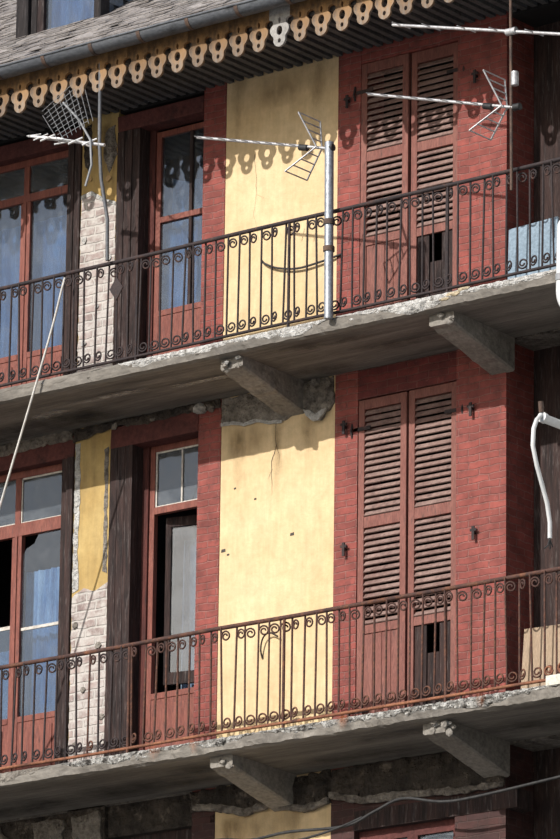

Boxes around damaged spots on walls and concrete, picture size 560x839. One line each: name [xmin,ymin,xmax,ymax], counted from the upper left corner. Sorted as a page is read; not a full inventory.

peeling [84,124,118,182]
flaking render [0,191,325,394]
spalling [335,269,556,325]
flaking render [303,376,335,421]
flaking render [0,394,556,767]
spalling [0,765,51,783]
flaking render [189,752,505,817]